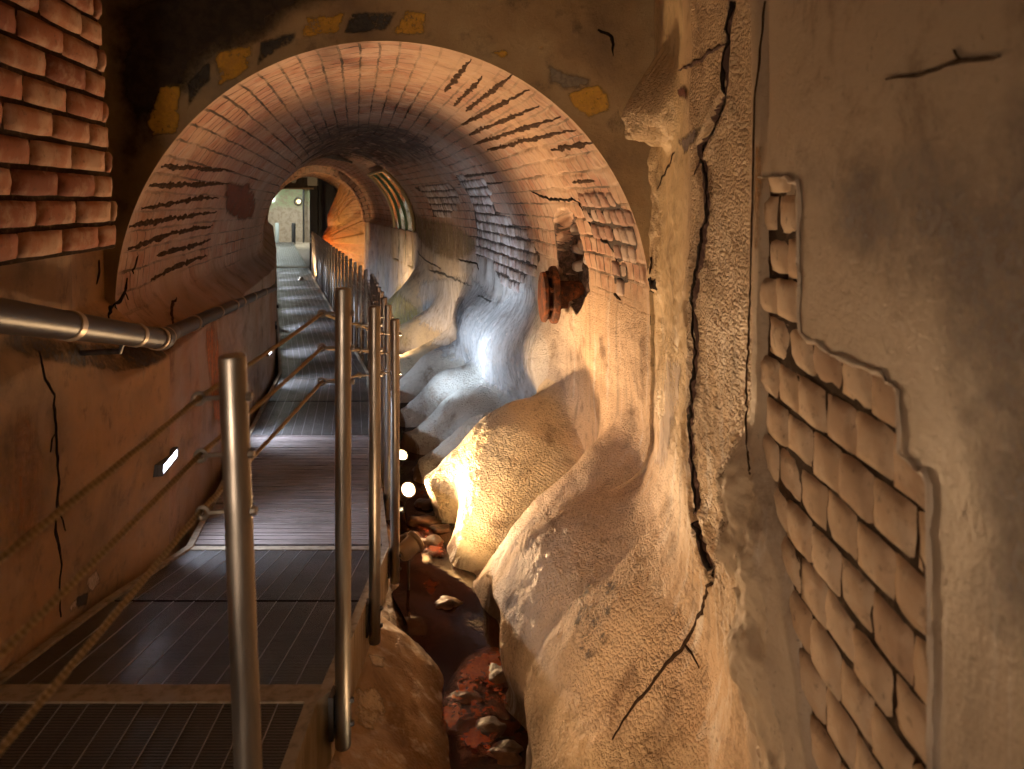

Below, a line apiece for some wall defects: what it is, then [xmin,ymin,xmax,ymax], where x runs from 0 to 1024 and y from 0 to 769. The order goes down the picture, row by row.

peeling [147,11,425,135]
peeling [570,85,609,116]
crack [884,49,1002,80]
crack [39,353,66,617]
flaking render [554,192,638,313]
crack [612,1,736,740]
crack [744,1,766,475]
flaking render [757,175,934,769]